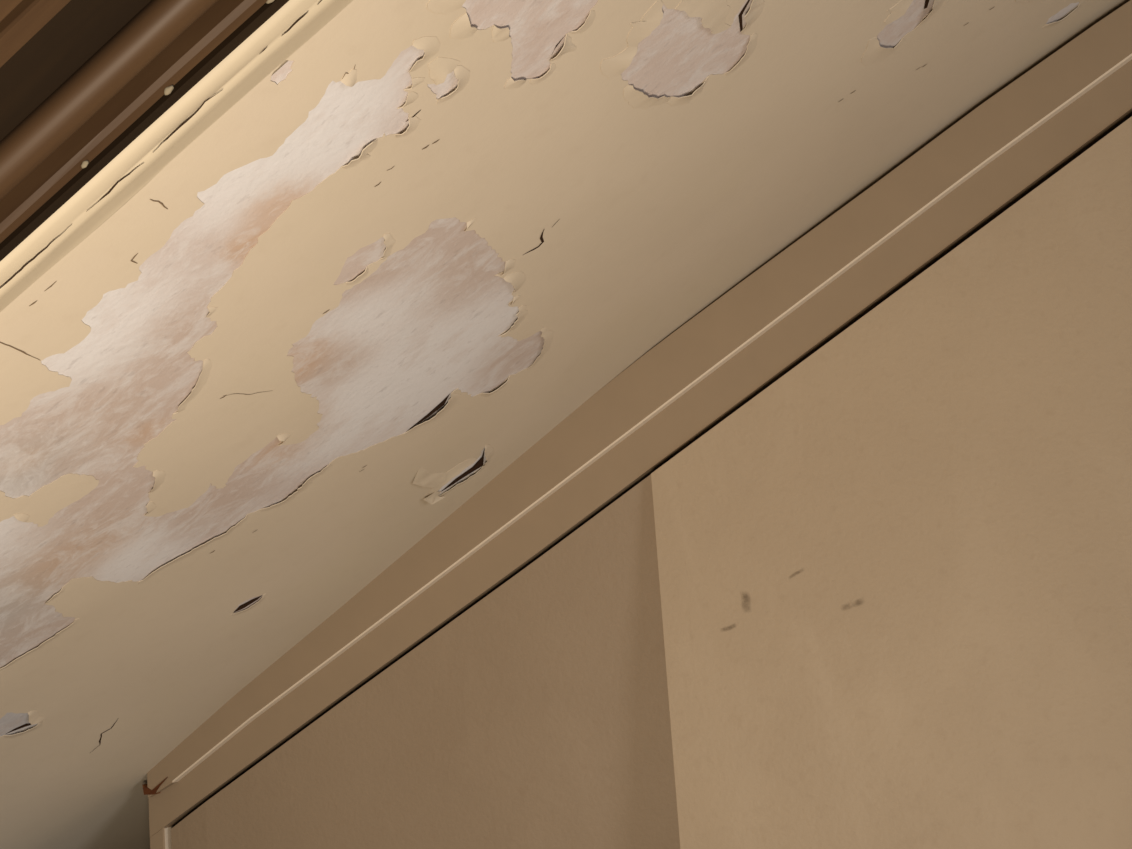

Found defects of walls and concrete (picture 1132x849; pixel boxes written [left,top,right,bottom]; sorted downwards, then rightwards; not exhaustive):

peeling [600,0,765,109]
peeling [861,0,945,65]
peeling [0,0,598,671]
peeling [0,710,46,738]